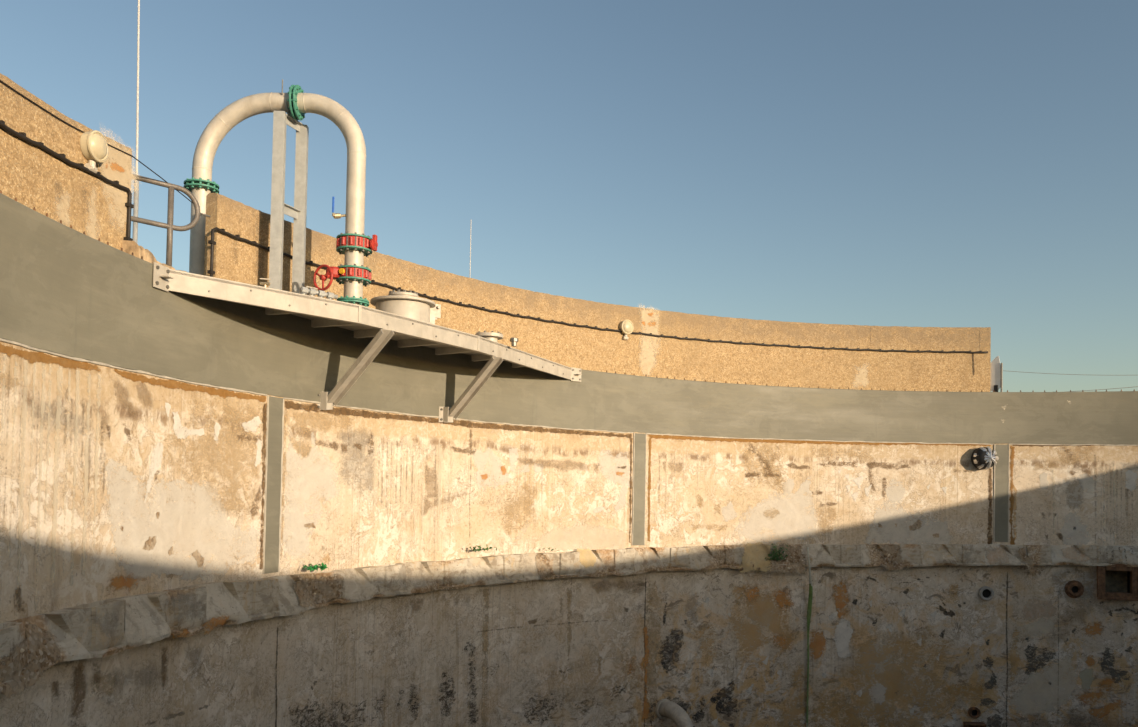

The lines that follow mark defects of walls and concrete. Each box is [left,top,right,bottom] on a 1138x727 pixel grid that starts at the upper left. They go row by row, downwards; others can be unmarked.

peeling [165,403,221,443]
peeling [242,416,262,466]
mould [289,667,420,727]
water stain [439,627,498,724]
mould [658,602,687,673]
peeling [829,611,853,658]
water stain [980,639,1002,727]
water stain [1024,638,1056,675]
water stain [1079,633,1133,689]